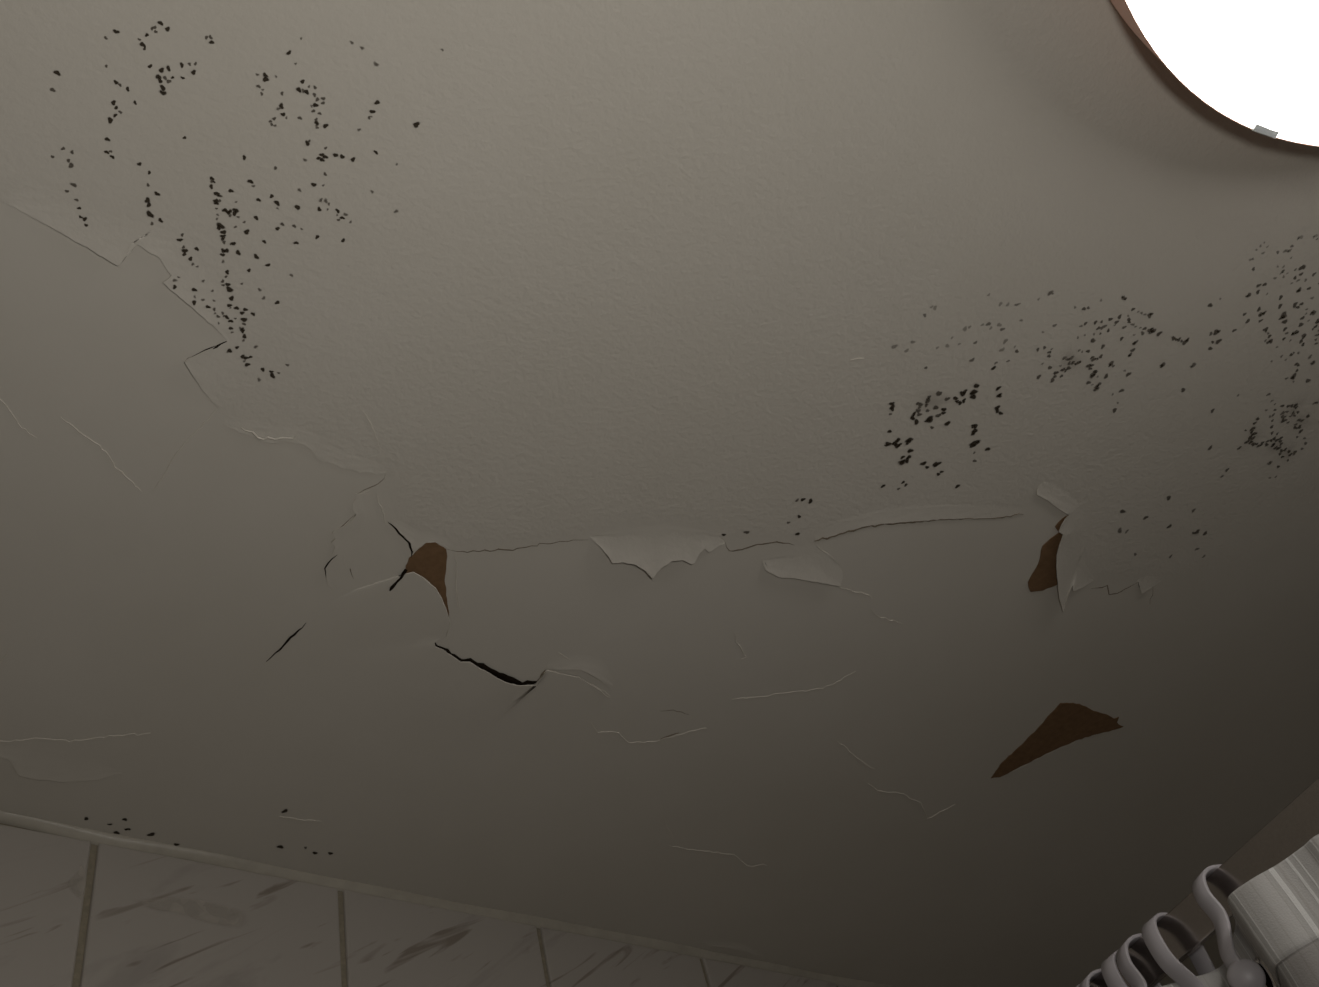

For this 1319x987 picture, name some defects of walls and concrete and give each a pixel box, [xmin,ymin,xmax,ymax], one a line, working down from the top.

mould [138,21,197,95]
mould [173,79,355,381]
peeling [0,182,244,491]
mould [1037,296,1189,413]
mould [1208,245,1319,383]
mould [884,384,980,476]
spalling [388,519,460,616]
peeling [590,525,726,579]
peeling [1028,482,1095,611]
crack [266,623,306,662]
crack [435,643,546,685]
spalling [991,703,1123,779]